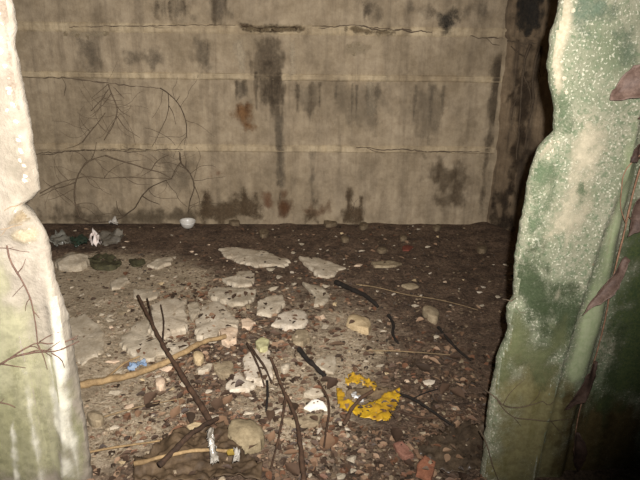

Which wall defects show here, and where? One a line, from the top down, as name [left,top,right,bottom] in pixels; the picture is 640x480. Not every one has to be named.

crack [321,25,432,33]
water stain [241,24,298,103]
water stain [489,60,501,121]
corrosion [237,104,252,128]
crack [356,146,487,154]
water stain [491,72,532,229]
water stain [549,125,604,235]
water stain [171,194,261,224]
corrosion [279,202,290,216]
water stain [343,188,363,224]
water stain [552,394,640,477]